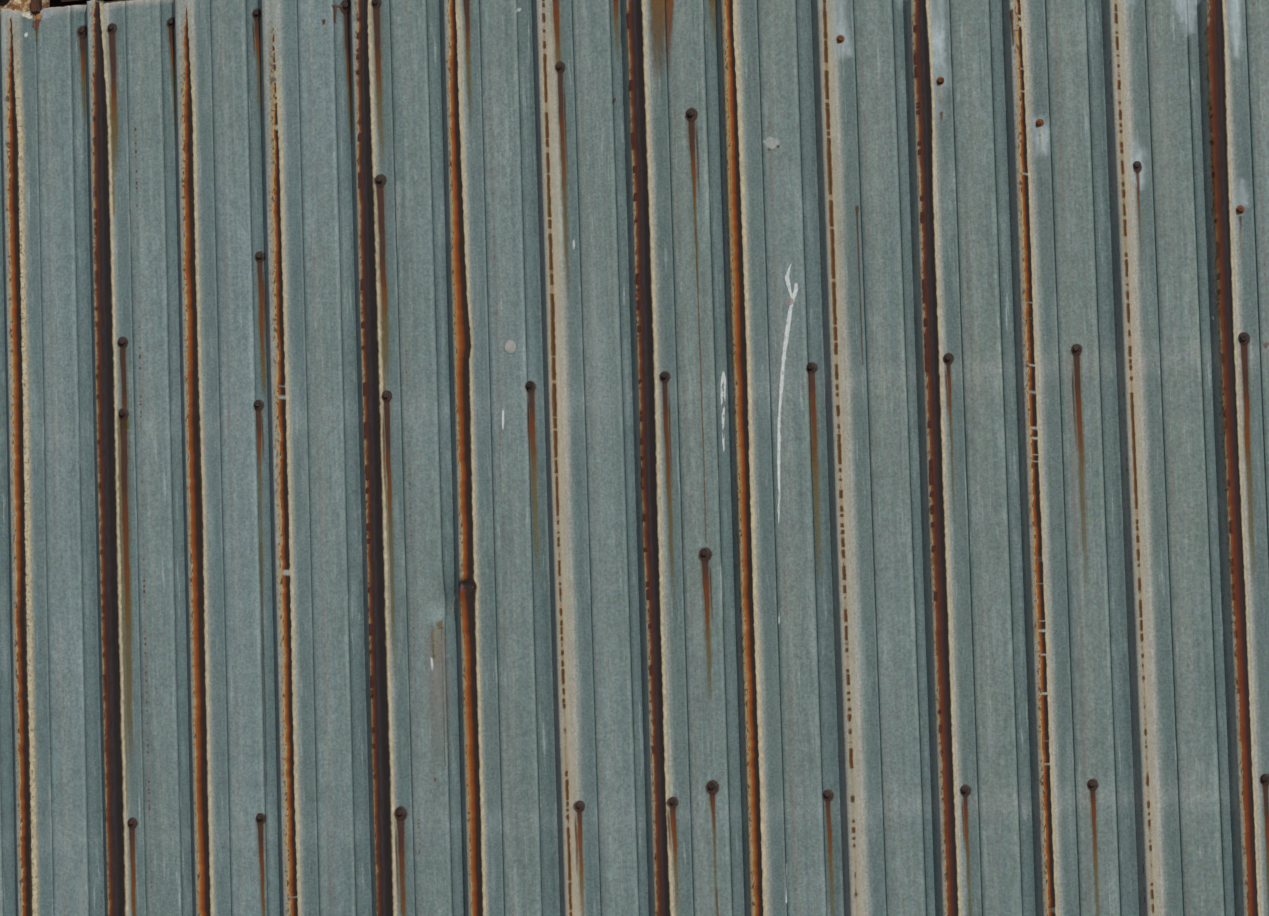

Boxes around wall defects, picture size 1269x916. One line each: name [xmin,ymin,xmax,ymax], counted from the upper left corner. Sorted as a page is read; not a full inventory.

corrosion [6,19,39,916]
corrosion [77,1,150,916]
corrosion [167,8,214,916]
corrosion [252,9,301,916]
corrosion [322,0,419,916]
corrosion [447,0,487,916]
corrosion [613,0,678,916]
corrosion [686,108,706,522]
corrosion [710,0,768,916]
corrosion [912,0,971,916]
corrosion [1010,0,1059,916]
corrosion [1206,0,1269,916]